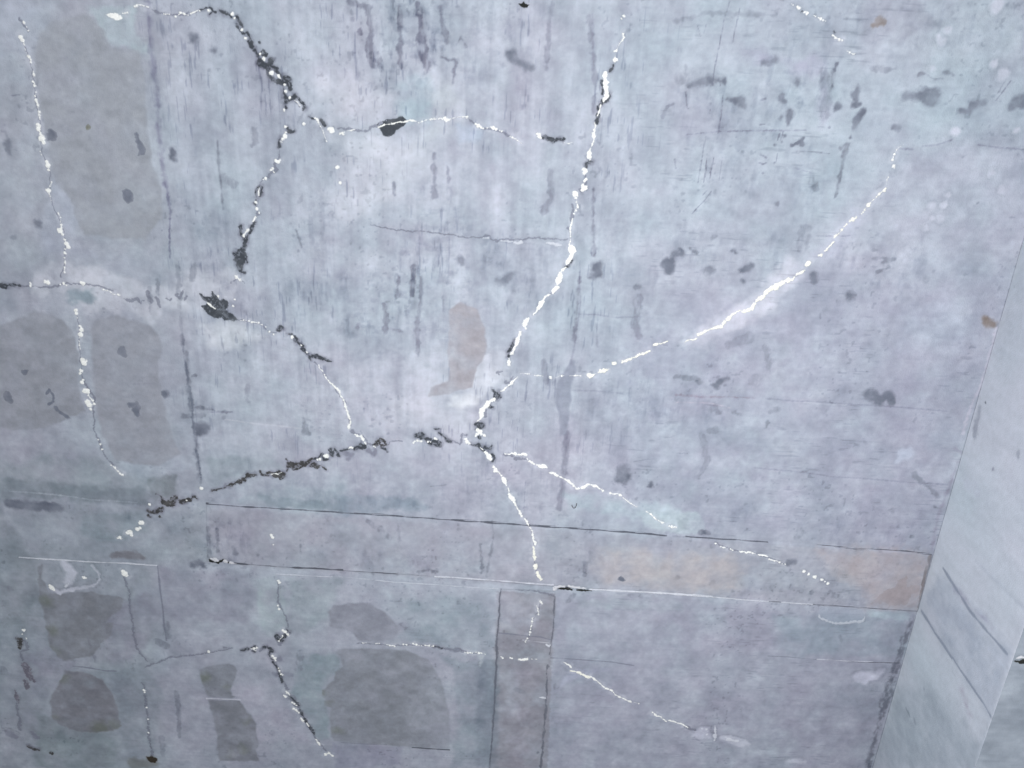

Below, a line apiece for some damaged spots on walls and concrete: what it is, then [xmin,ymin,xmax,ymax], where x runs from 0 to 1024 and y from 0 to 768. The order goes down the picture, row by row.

crack [0,17,189,477]
leakage [427,300,489,398]
crack [105,3,904,661]
crack [120,569,335,757]
crack [563,662,696,731]